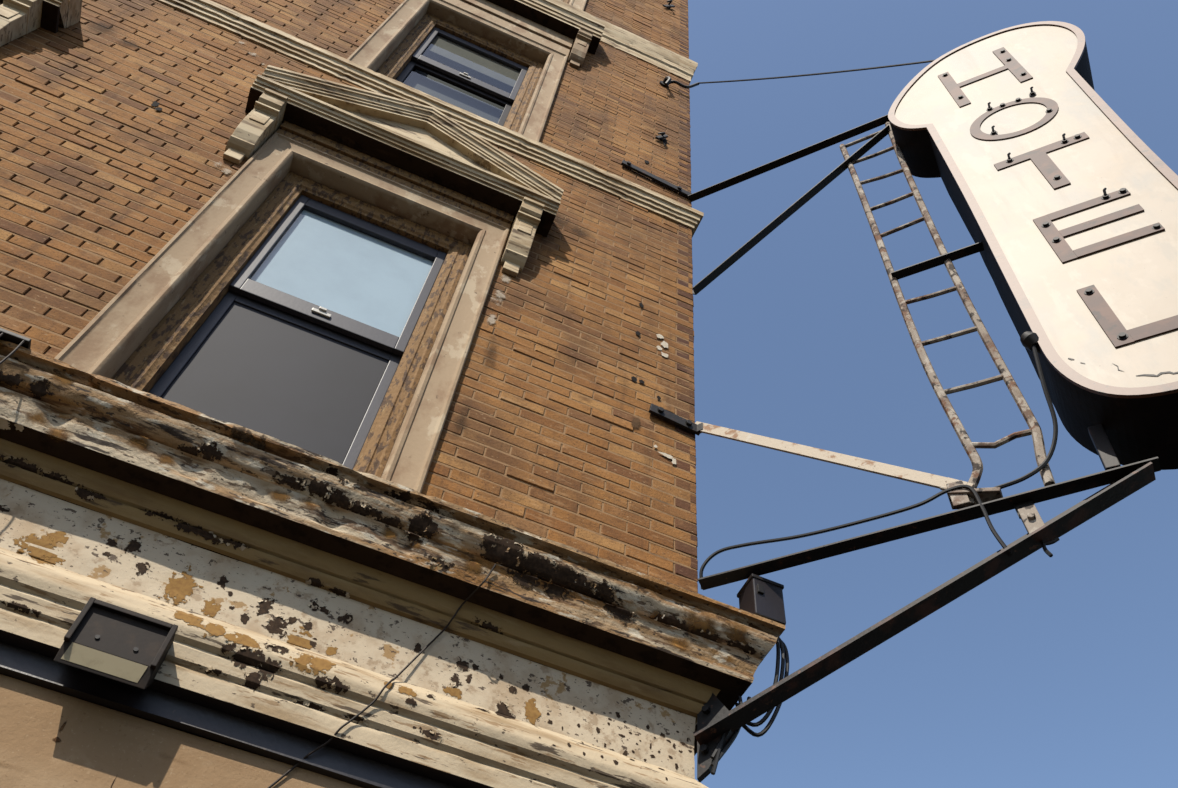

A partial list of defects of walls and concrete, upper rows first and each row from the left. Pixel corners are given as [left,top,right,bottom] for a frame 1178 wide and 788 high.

peeling [0,454,106,501]
peeling [268,466,439,546]
peeling [13,531,69,566]
peeling [102,534,150,576]
peeling [1,600,42,618]
peeling [158,565,354,694]
spalling [476,533,757,655]
peeling [291,697,325,712]
peeling [344,714,368,726]
peeling [384,659,480,705]
peeling [477,674,563,738]
spalling [552,712,692,781]